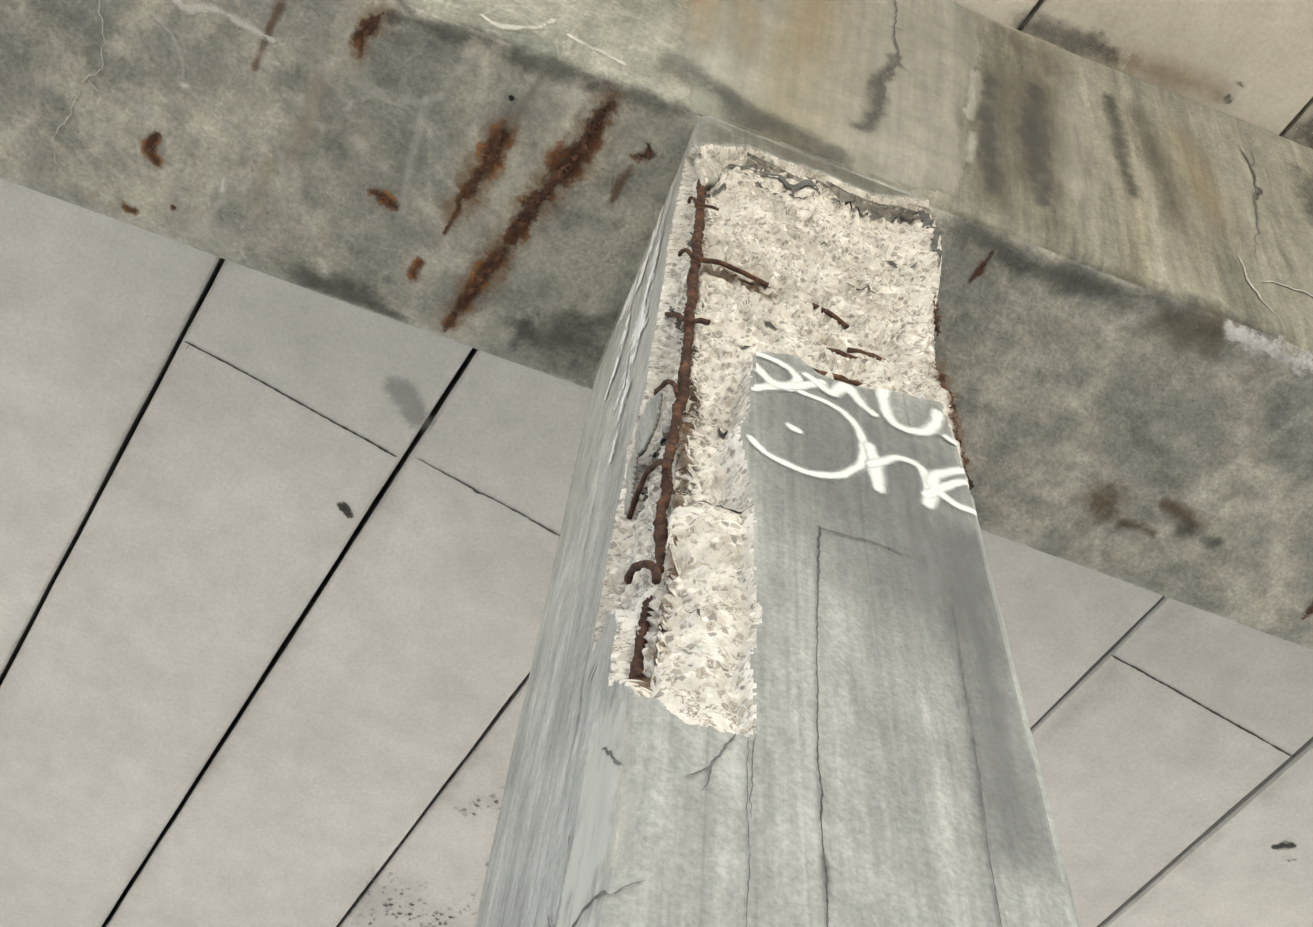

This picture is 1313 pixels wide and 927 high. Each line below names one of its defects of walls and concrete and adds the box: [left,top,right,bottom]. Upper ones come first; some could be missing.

rust [253,2,284,68]
rust [351,12,385,57]
crack [855,0,907,129]
rust [141,131,162,167]
rust [442,75,617,332]
water stain [958,219,1313,376]
spalling [592,144,970,737]
crack [548,880,645,927]